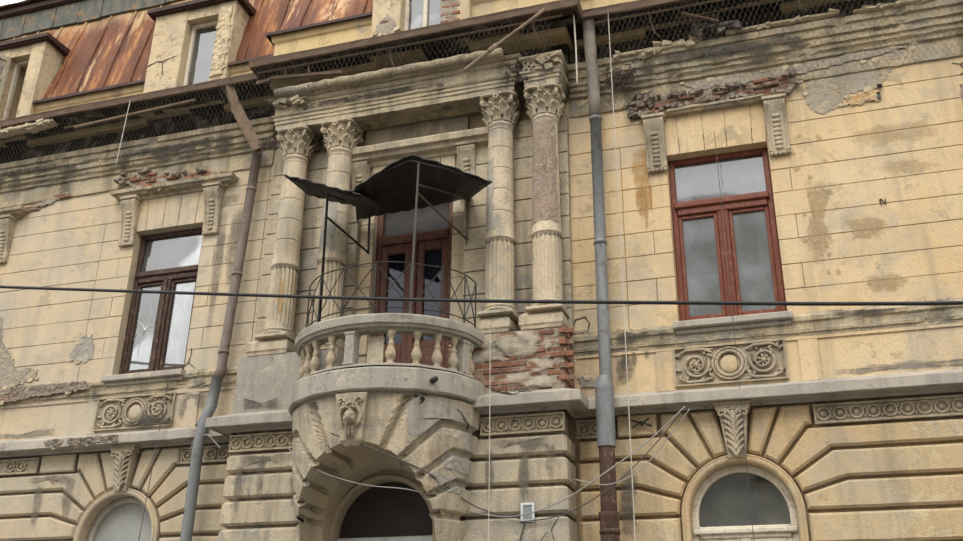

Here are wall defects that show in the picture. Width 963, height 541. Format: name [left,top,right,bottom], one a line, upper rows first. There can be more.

flaking render [440,0,460,24]
flaking render [605,8,918,121]
flaking render [113,166,220,197]
spalling [0,348,90,405]
spalling [69,333,94,364]
flaking render [472,327,596,394]